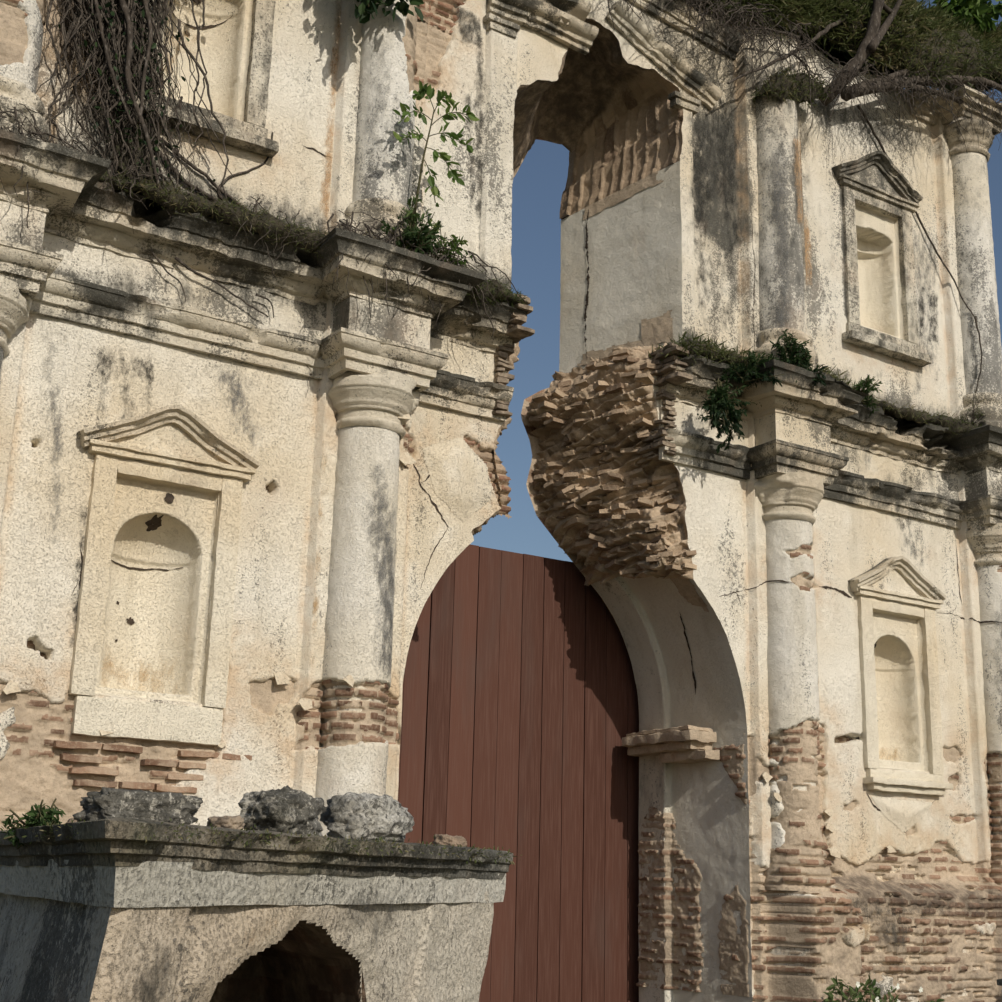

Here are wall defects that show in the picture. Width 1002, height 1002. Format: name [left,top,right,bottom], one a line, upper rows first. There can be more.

water stain [694,99,739,222]
crack [583,210,591,357]
water stain [370,466,395,672]
crack [413,464,448,589]
spalling [464,294,535,535]
spalling [525,310,709,612]
crack [719,580,792,603]
crack [819,586,852,598]
crack [945,548,1002,624]
spalling [0,680,226,831]
spalling [248,672,399,750]
spalling [713,720,1002,1002]